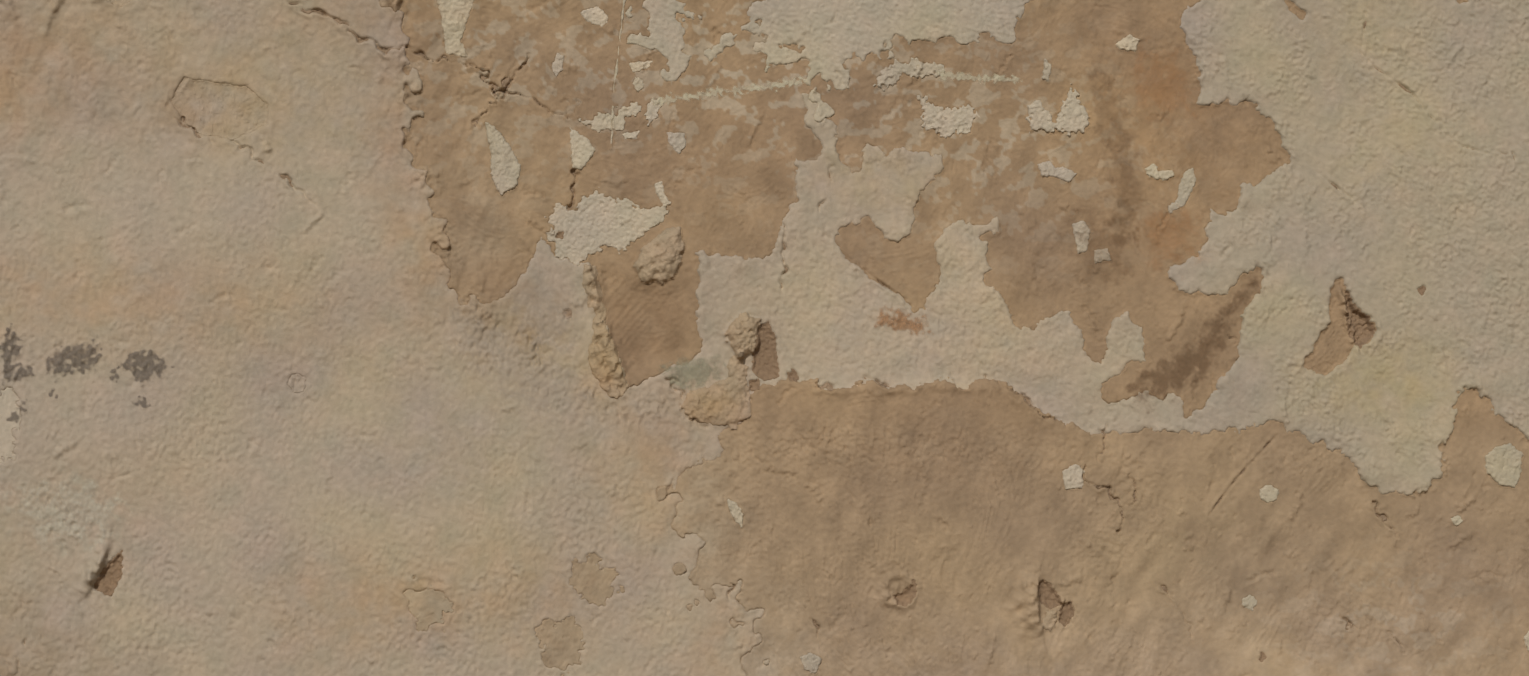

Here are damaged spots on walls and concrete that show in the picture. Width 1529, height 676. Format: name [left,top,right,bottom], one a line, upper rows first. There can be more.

crack [178,117,201,138]
crack [240,147,293,187]
crack [289,3,571,127]
crack [611,0,627,144]
spalling [399,0,1529,676]